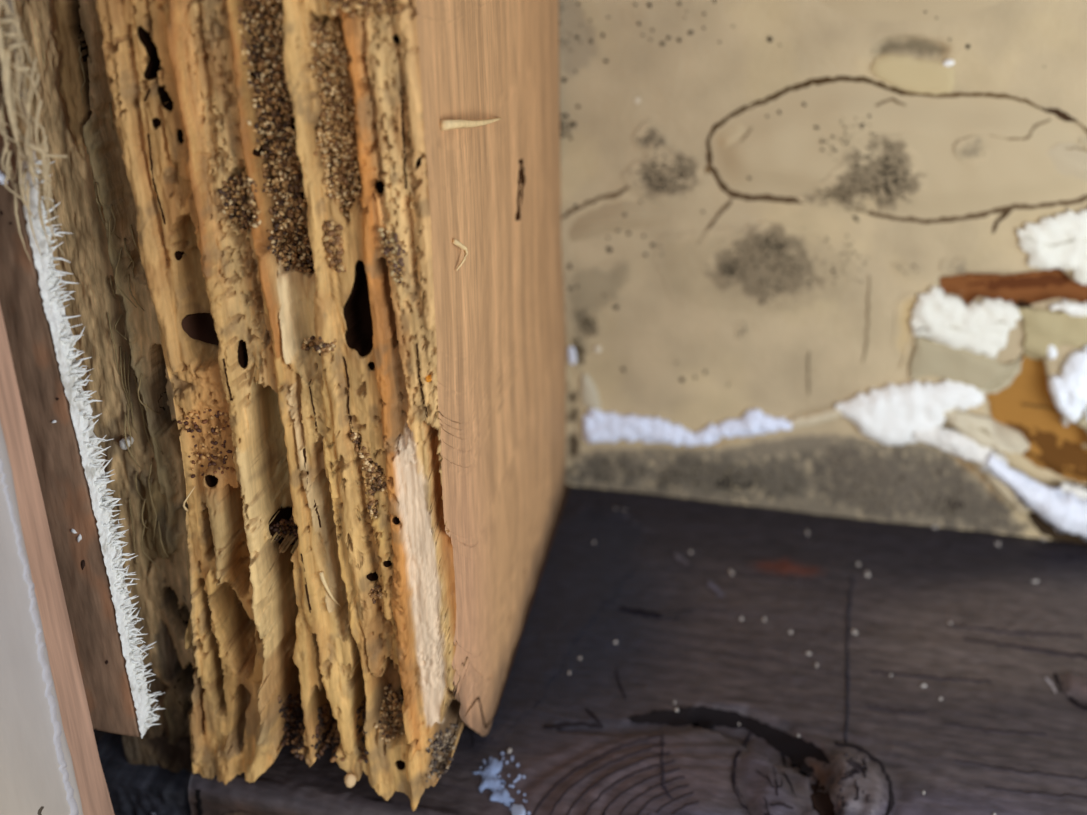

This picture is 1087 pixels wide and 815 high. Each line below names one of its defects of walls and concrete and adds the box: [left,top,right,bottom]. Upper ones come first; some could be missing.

leakage [622,120,706,204]
leakage [564,221,868,379]
leakage [797,114,931,222]
crack [697,76,1087,246]
peeling [1017,208,1087,285]
peeling [566,286,1087,544]
leakage [472,431,1038,815]